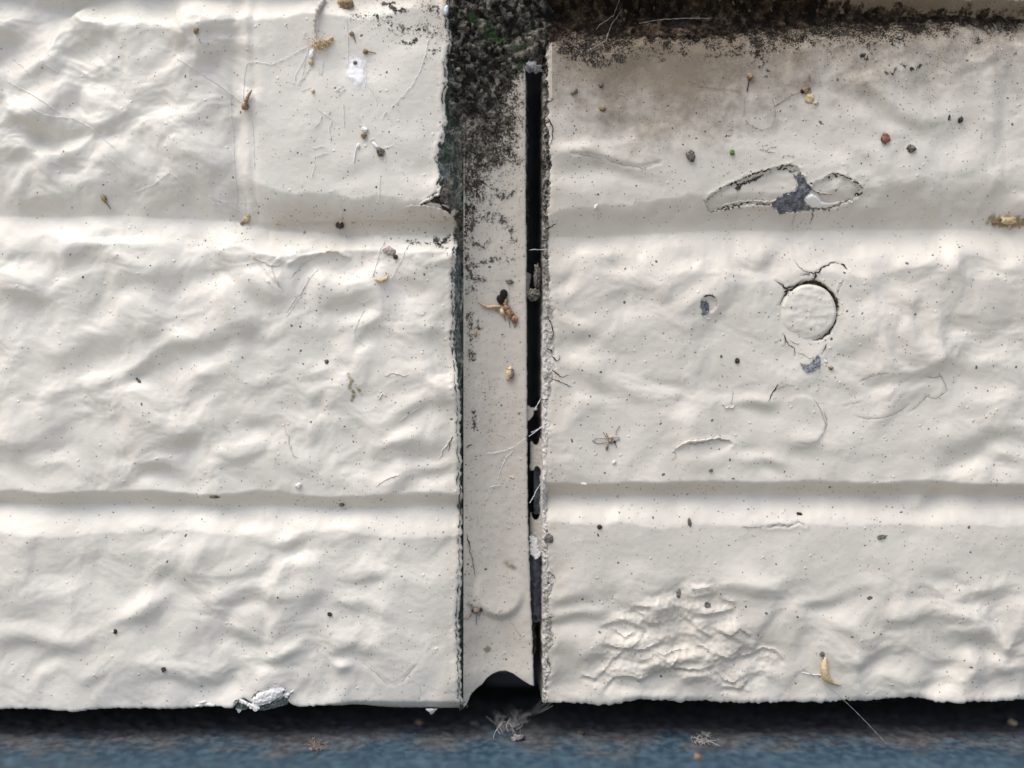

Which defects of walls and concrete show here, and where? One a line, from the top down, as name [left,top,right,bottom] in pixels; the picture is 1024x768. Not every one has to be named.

damp [351,0,1024,295]
peeling [706,146,863,225]
spalling [700,293,717,319]
damp [465,311,483,361]
spalling [800,355,821,373]
spalling [234,686,294,713]